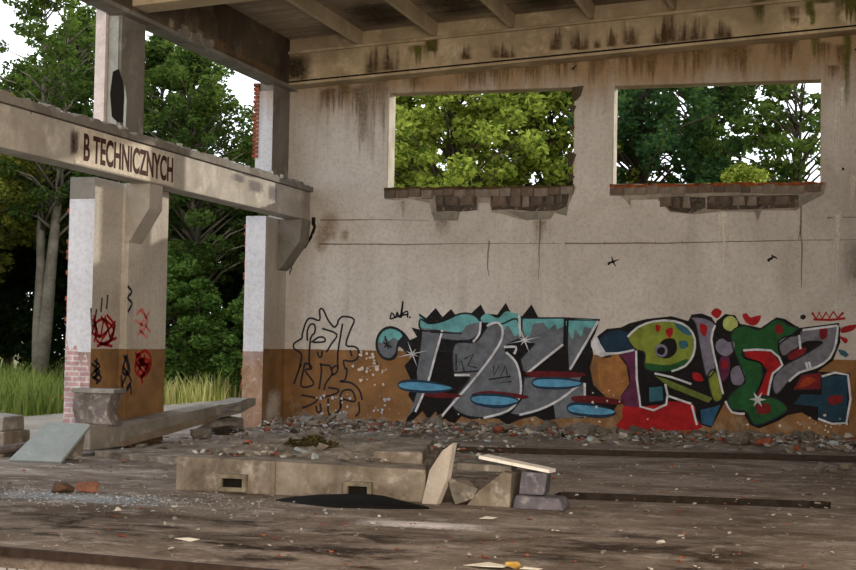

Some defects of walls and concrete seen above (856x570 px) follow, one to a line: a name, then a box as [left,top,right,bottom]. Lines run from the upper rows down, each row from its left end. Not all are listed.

water stain [367,49,393,73]
water stain [410,40,437,60]
water stain [571,30,636,49]
water stain [812,35,854,133]
spalling [384,184,577,220]
spalling [610,181,827,221]